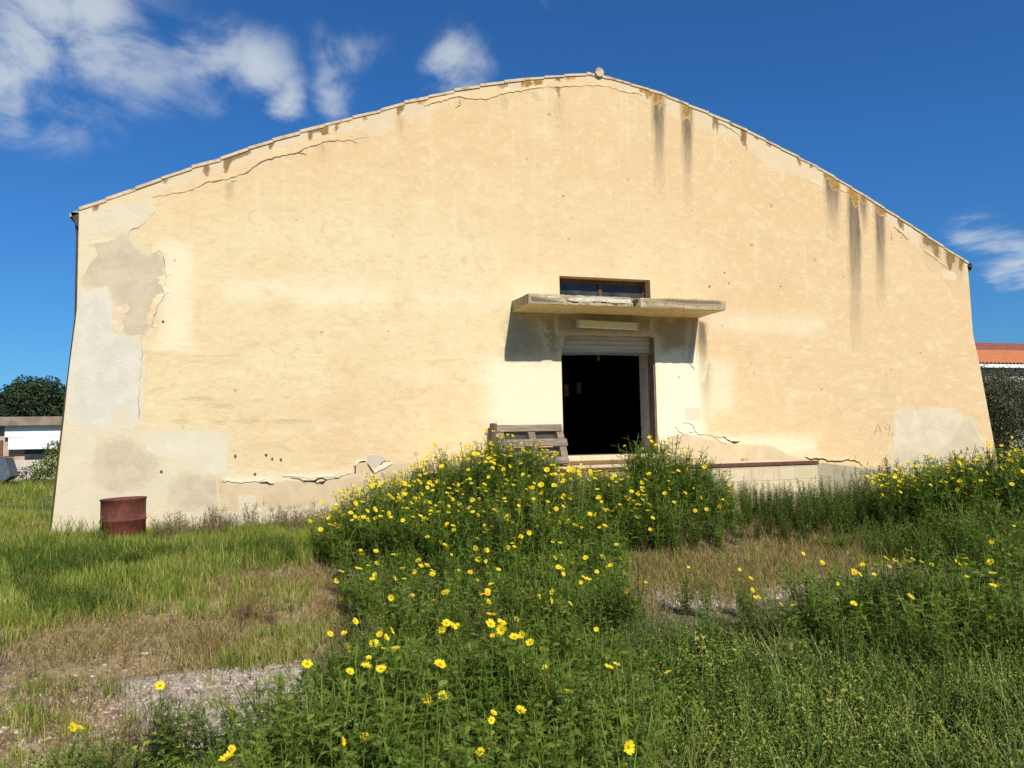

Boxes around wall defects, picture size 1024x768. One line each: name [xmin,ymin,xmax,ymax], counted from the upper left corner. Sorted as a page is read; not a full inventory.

crack [423,79,643,109]
leakage [650,96,667,192]
leakage [680,103,695,205]
spalling [78,236,116,281]
crack [128,131,369,420]
leakage [822,172,887,353]
crack [682,419,740,444]
spalling [354,455,393,476]
crack [805,453,865,467]